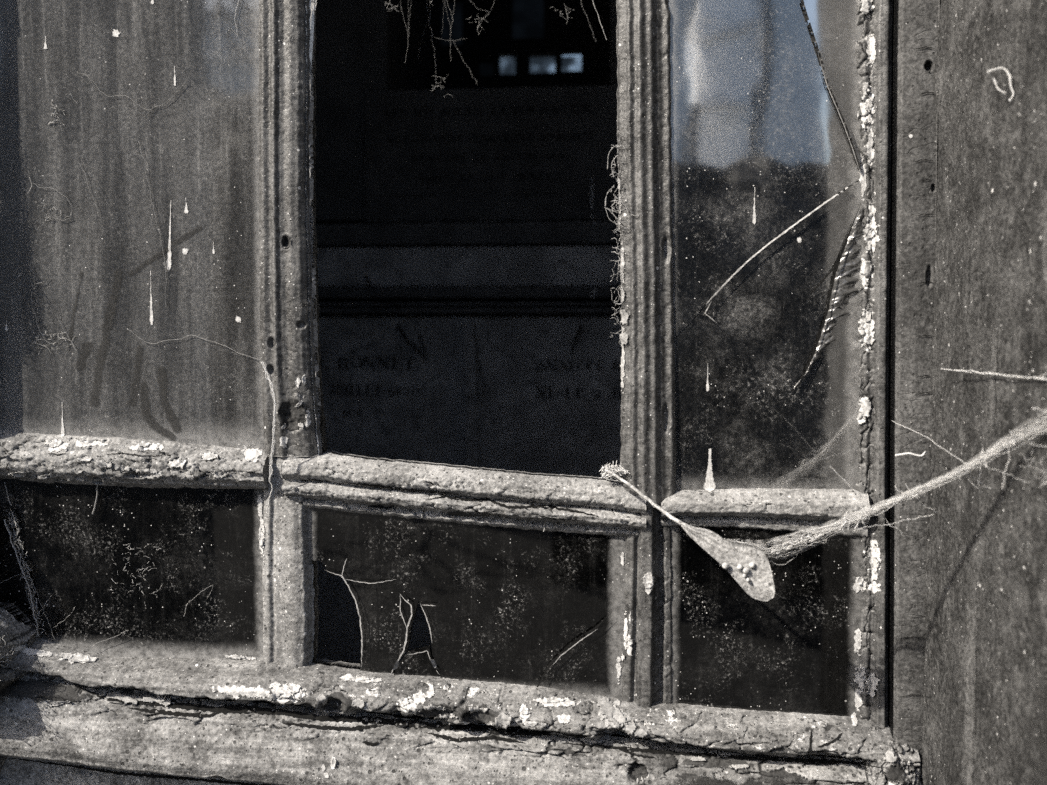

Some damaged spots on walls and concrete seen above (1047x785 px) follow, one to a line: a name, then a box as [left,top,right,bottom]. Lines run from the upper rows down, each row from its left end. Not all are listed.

peeling [860,0,875,18]
peeling [865,34,876,67]
peeling [795,82,880,388]
peeling [857,396,872,424]
peeling [643,573,655,595]
peeling [616,611,633,685]
peeling [212,673,382,712]
spalling [396,684,576,730]
peeling [581,696,647,744]
spalling [682,756,754,771]
spalling [863,740,923,785]